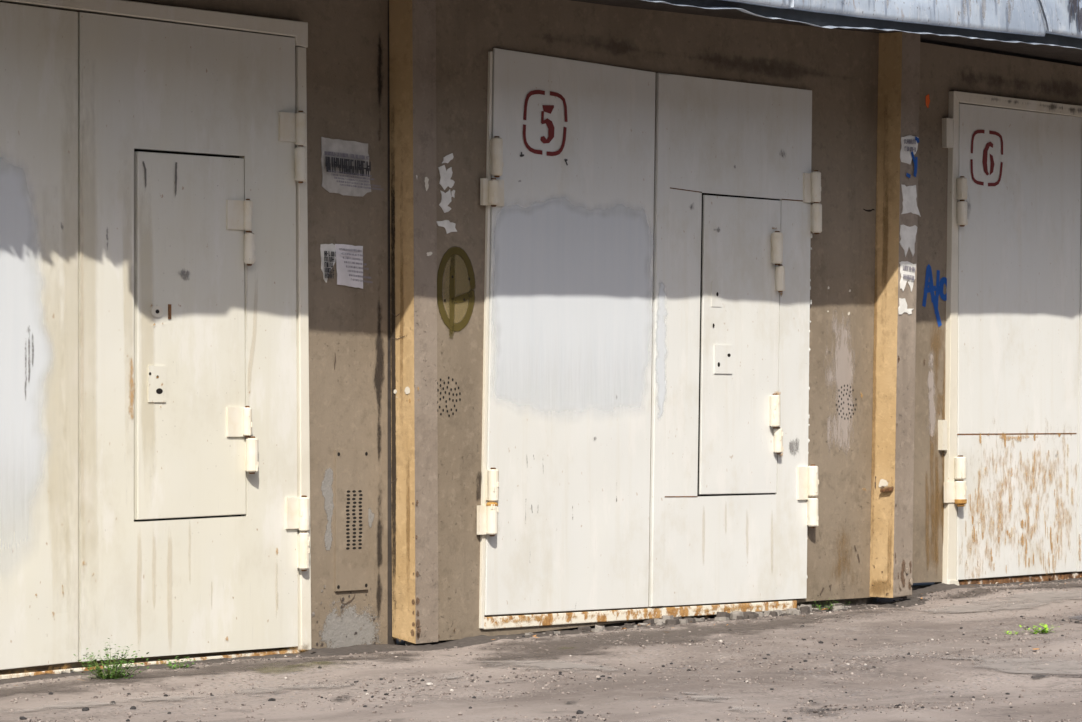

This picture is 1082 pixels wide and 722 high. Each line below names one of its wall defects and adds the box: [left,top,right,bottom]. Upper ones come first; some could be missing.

corrosion [954,434,1070,573]